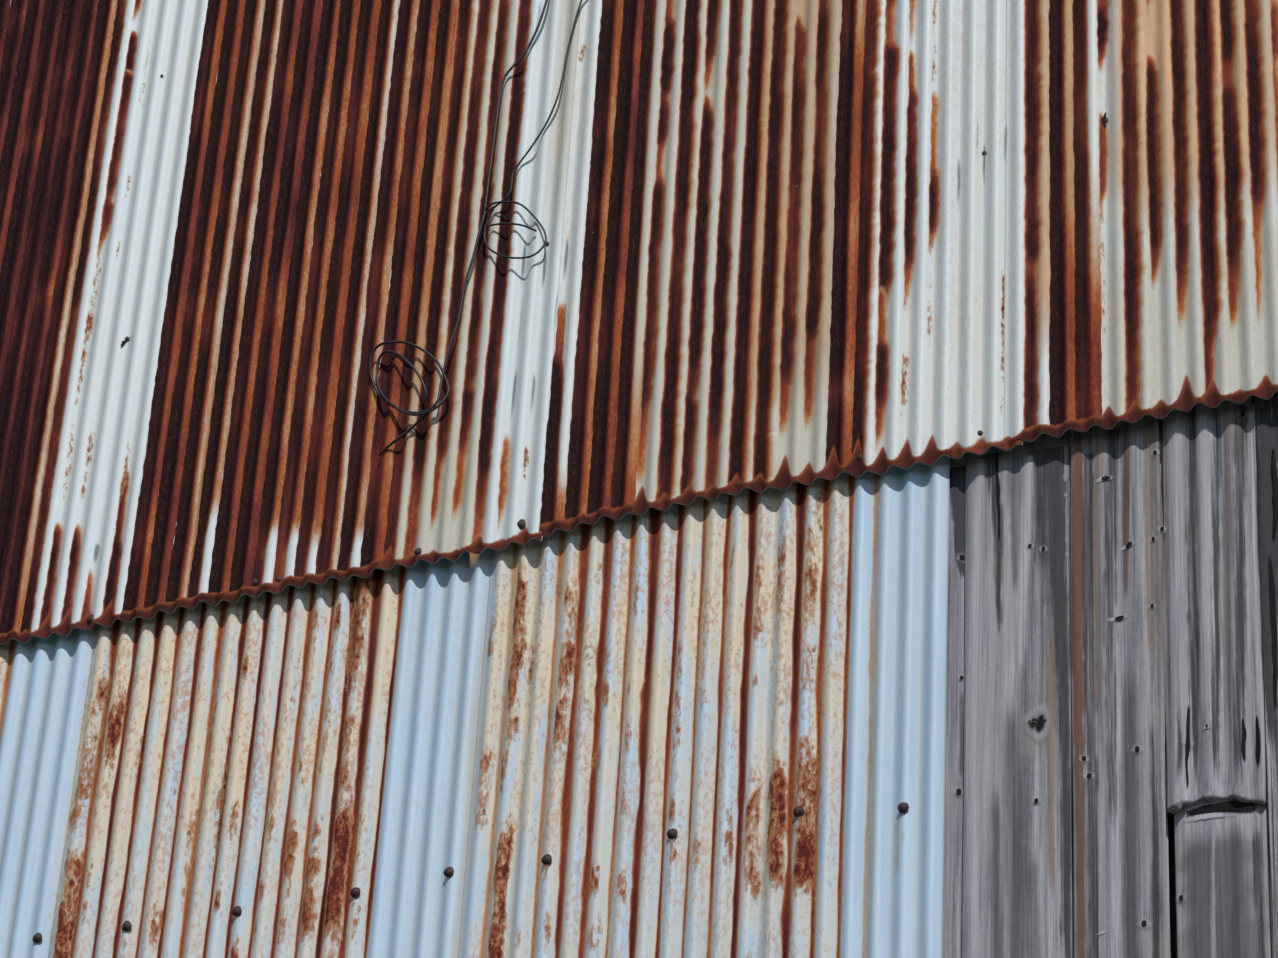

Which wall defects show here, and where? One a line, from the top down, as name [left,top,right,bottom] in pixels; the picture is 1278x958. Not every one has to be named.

rust [77,31,138,392]
rust [431,0,510,525]
rust [704,0,721,90]
rust [875,0,900,443]
rust [904,50,918,304]
rust [929,94,940,251]
rust [1097,0,1110,69]
rust [480,556,528,958]
rust [552,523,591,958]
rust [655,504,685,958]
rust [706,494,735,958]
rust [815,479,831,790]